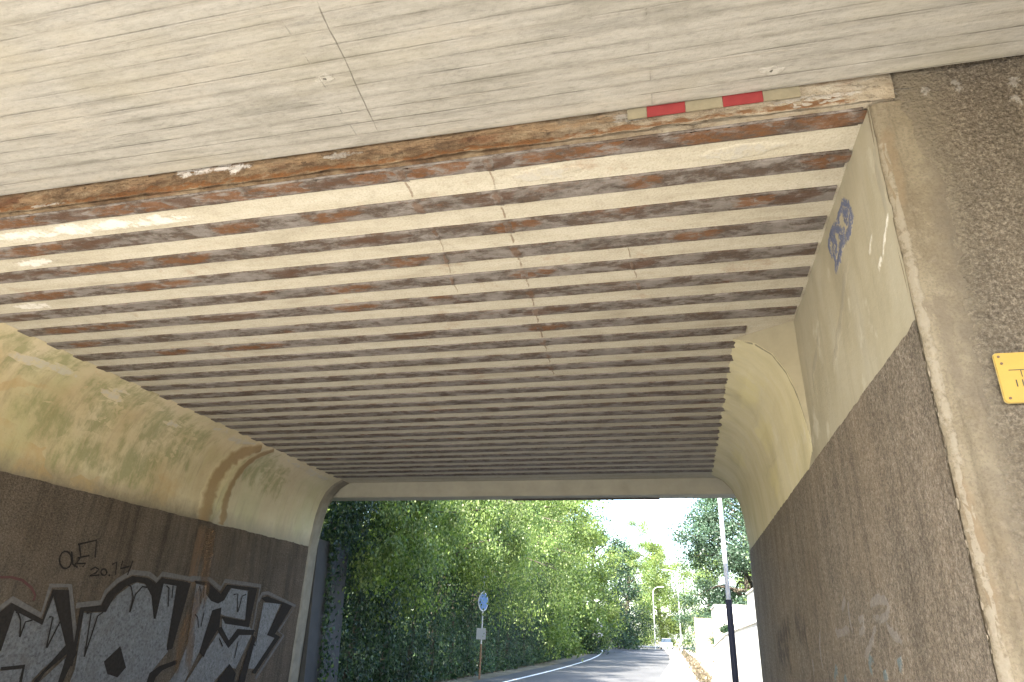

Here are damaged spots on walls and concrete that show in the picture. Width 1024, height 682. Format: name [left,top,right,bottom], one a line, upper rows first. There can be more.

spalling [61,112,629,195]
corrosion [0,93,874,375]
peeling [6,351,81,379]
damp [0,411,108,497]